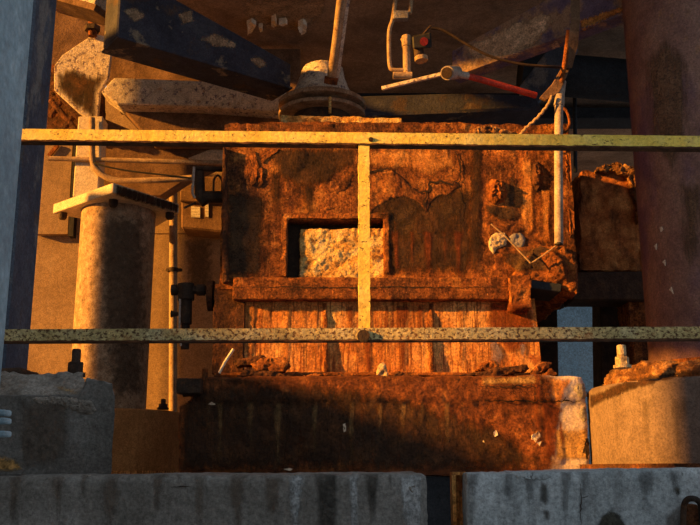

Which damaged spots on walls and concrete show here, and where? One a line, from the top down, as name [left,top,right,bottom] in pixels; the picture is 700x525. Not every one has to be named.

corrosion [647,42,686,136]
corrosion [21,139,700,272]
crack [415,150,465,226]
corrosion [279,306,289,328]
corrosion [487,303,531,327]
corrosion [4,338,700,471]
water stain [541,484,549,518]